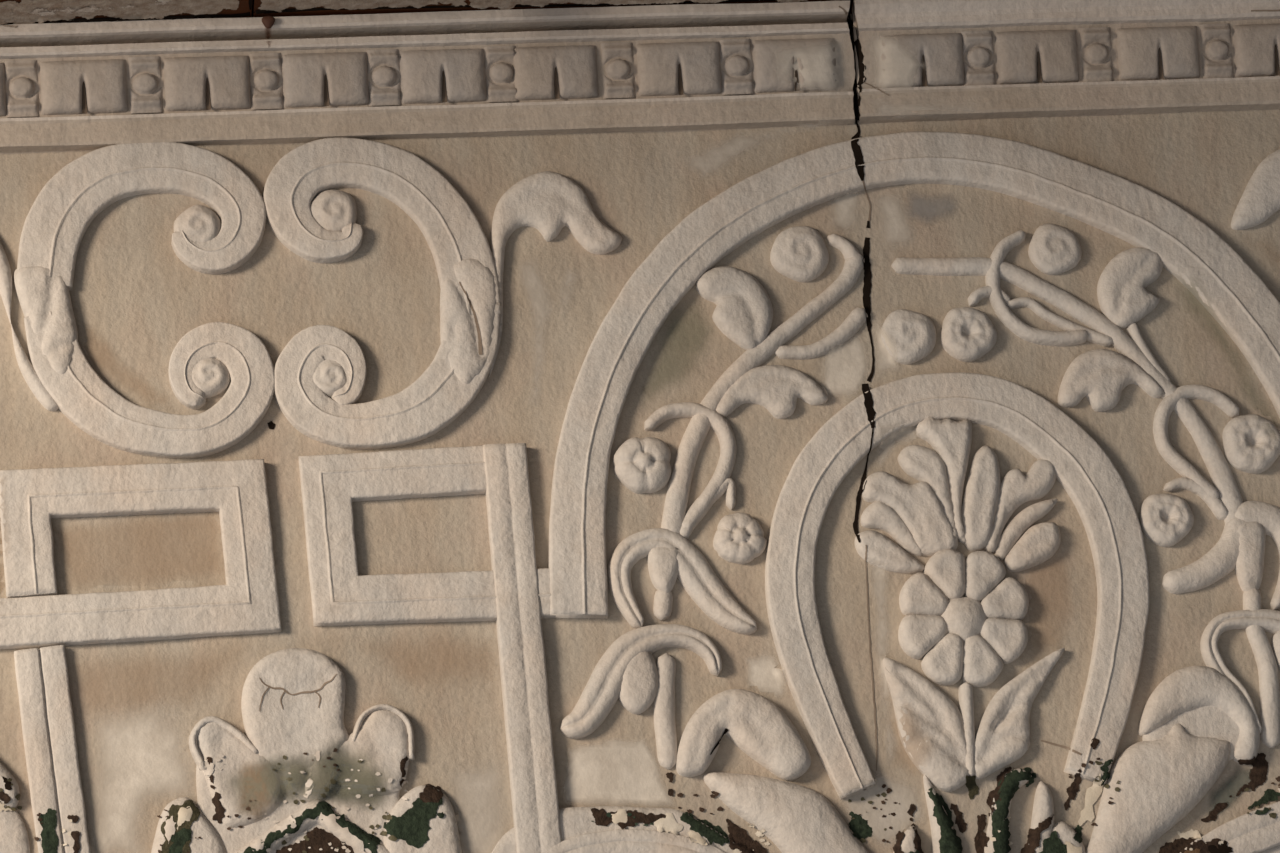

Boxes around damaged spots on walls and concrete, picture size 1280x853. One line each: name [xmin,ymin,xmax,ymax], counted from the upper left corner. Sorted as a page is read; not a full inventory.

crack [1,0,471,25]
crack [514,0,777,8]
crack [839,0,889,771]
peeling [0,776,22,812]
peeling [34,808,80,853]
peeling [157,748,444,853]
water stain [242,747,380,804]
peeling [590,772,770,853]
peeling [848,784,924,853]
peeling [927,738,1121,853]
peeling [1159,753,1280,853]